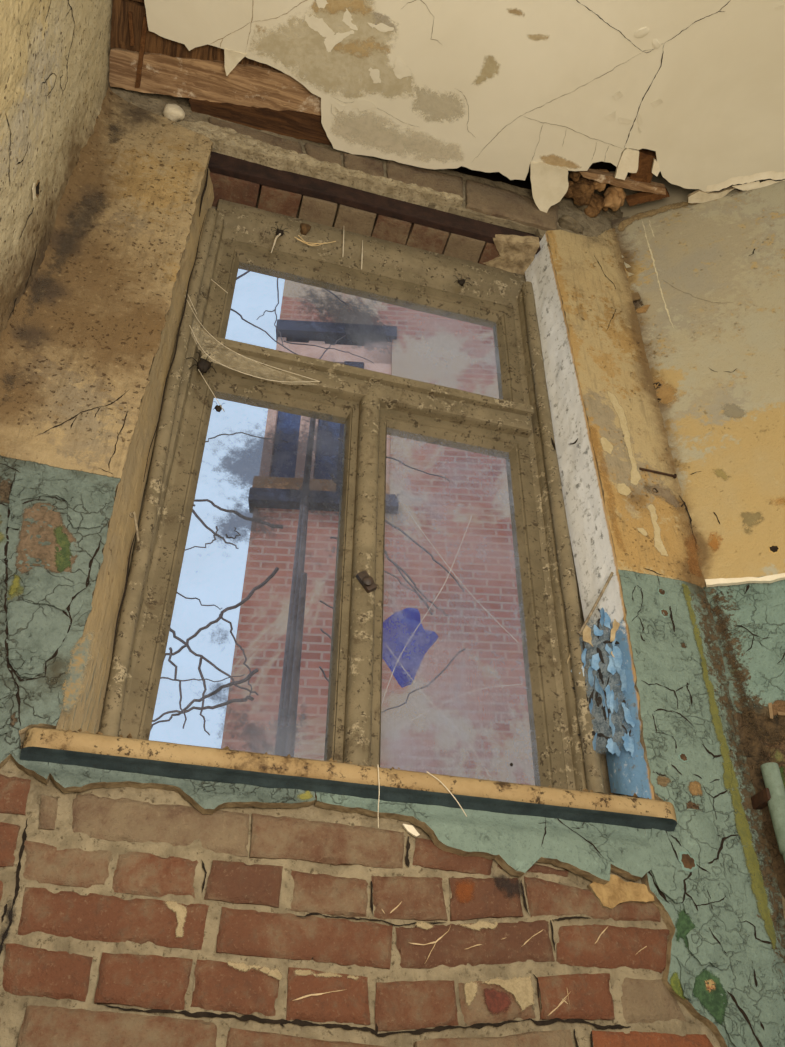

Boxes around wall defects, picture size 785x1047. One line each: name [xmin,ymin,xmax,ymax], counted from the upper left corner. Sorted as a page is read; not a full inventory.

crack [455,0,731,159]
crack [706,171,785,192]
spalling [631,292,650,313]
peeling [600,391,680,556]
crack [0,463,102,732]
peeling [6,471,112,715]
spalling [705,573,785,587]
peeling [567,607,635,757]
crack [0,818,28,954]
spalling [7,749,760,1047]
crack [643,681,737,953]
crack [727,970,764,1047]